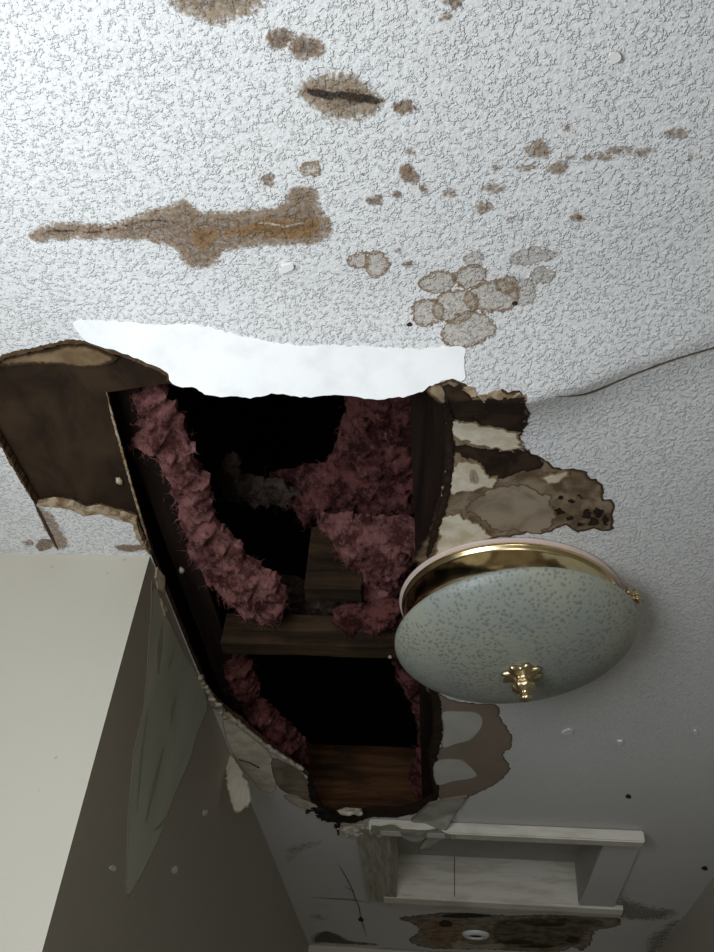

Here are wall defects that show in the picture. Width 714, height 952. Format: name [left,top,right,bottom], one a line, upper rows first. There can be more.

damp [171,0,265,25]
damp [266,27,325,60]
damp [299,72,417,121]
damp [365,148,426,205]
damp [411,264,520,348]
peeling [445,420,524,453]
peeling [441,459,498,496]
peeling [540,470,570,486]
peeling [433,512,494,555]
peeling [109,567,318,899]
peeling [411,686,513,831]
damp [399,889,684,952]